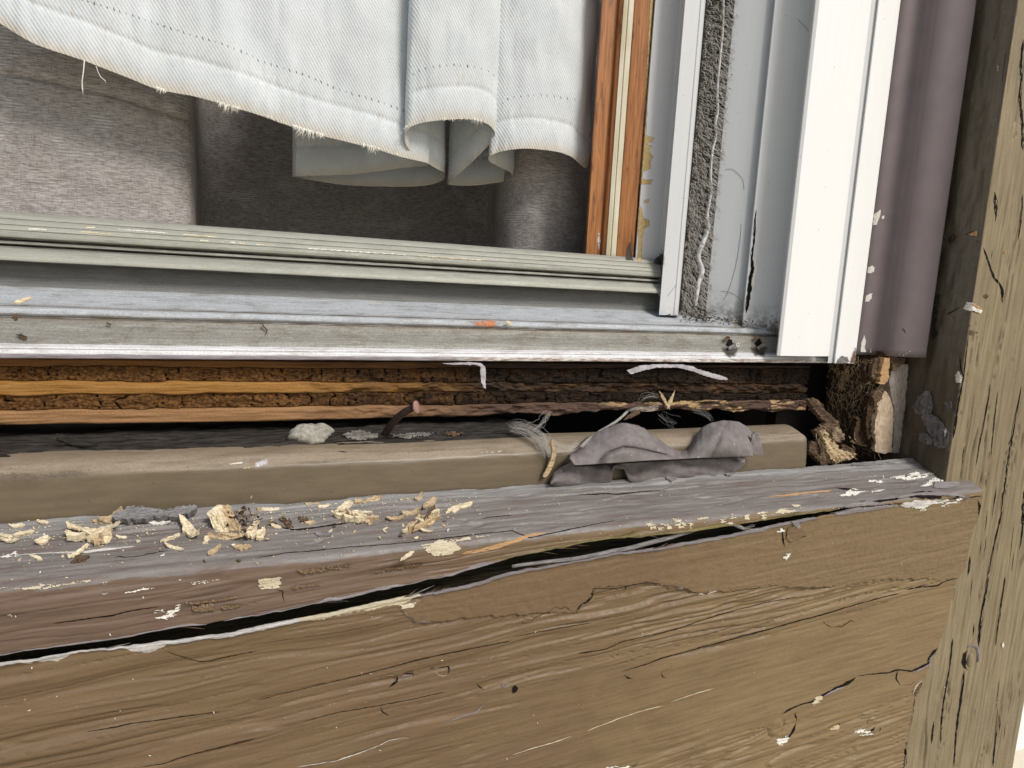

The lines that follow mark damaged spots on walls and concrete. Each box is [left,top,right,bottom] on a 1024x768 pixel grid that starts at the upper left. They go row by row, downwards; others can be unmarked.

peeling [833,471,962,515]
peeling [645,504,806,560]
peeling [371,535,489,573]
crack [0,341,1024,767]
peeling [0,580,108,594]
peeling [258,564,352,589]
peeling [595,581,758,595]